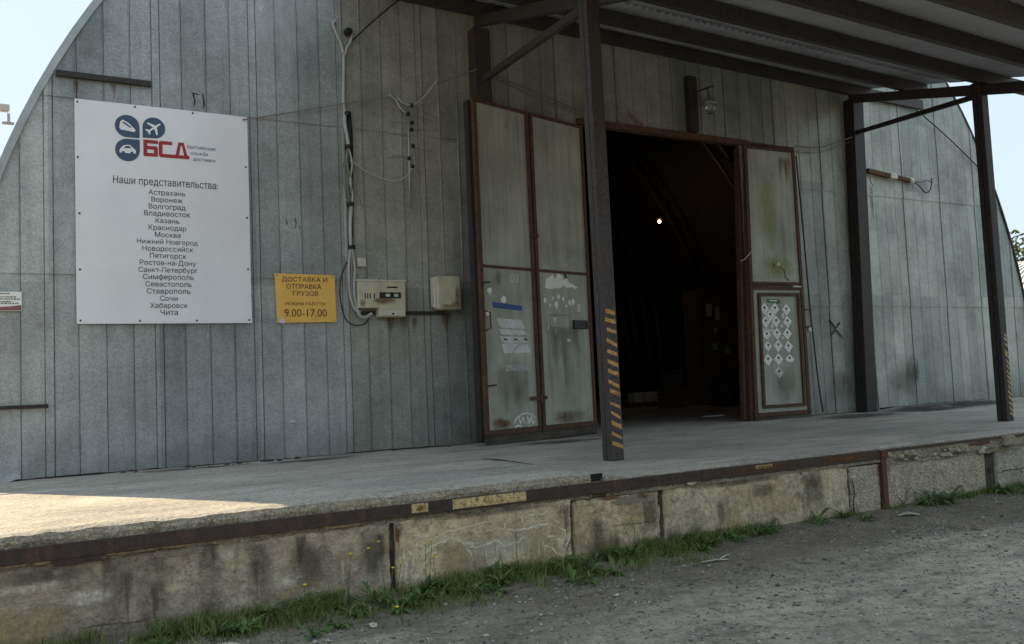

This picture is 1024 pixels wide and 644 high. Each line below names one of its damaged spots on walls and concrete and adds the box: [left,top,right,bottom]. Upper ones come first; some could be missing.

crack [846,469,857,511]